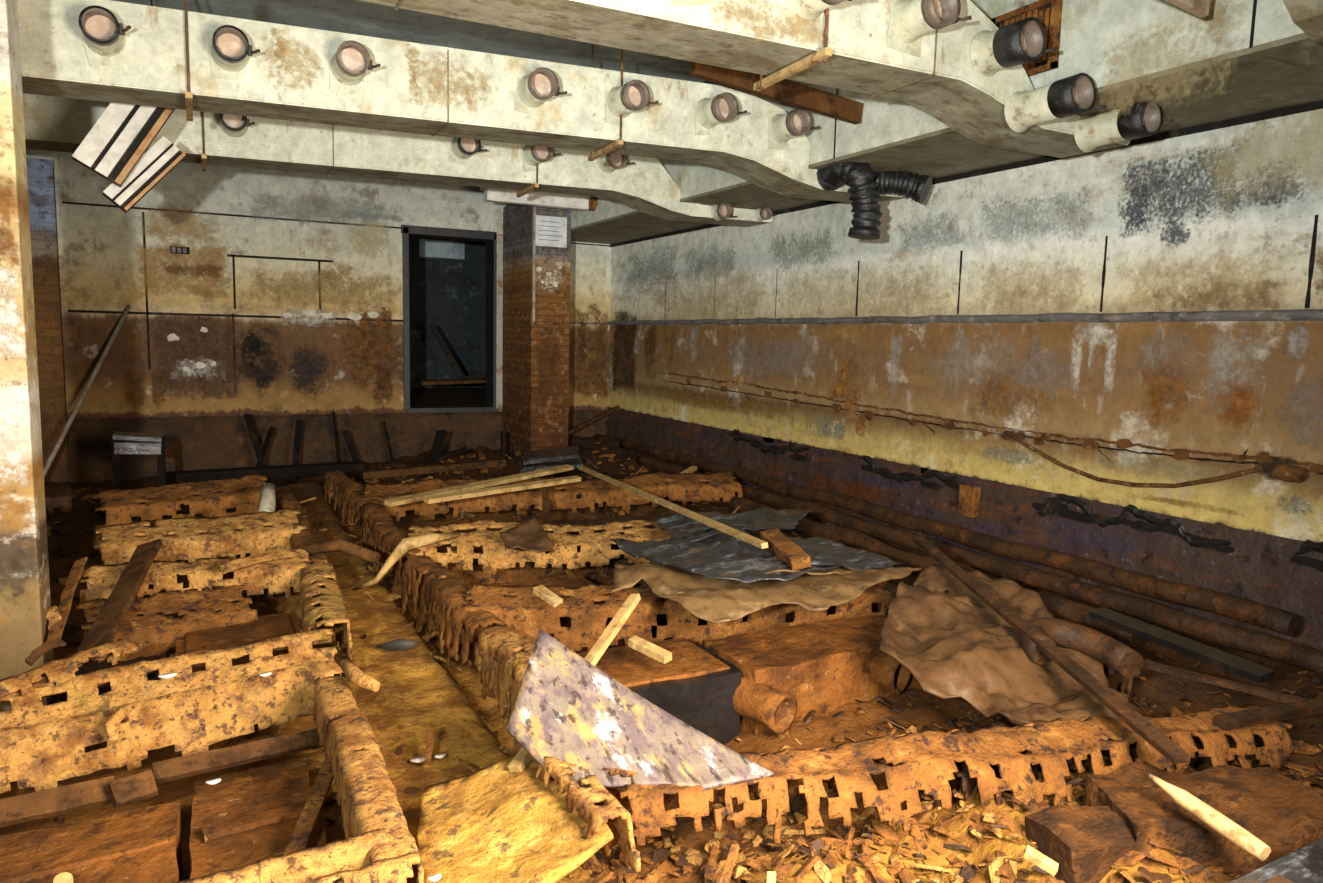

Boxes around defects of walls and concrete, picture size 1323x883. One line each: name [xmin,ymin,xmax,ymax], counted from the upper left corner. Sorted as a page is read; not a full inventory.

corrosion [0,181,18,267]
mould [1120,140,1304,247]
damp [152,315,326,403]
corrosion [343,307,395,403]